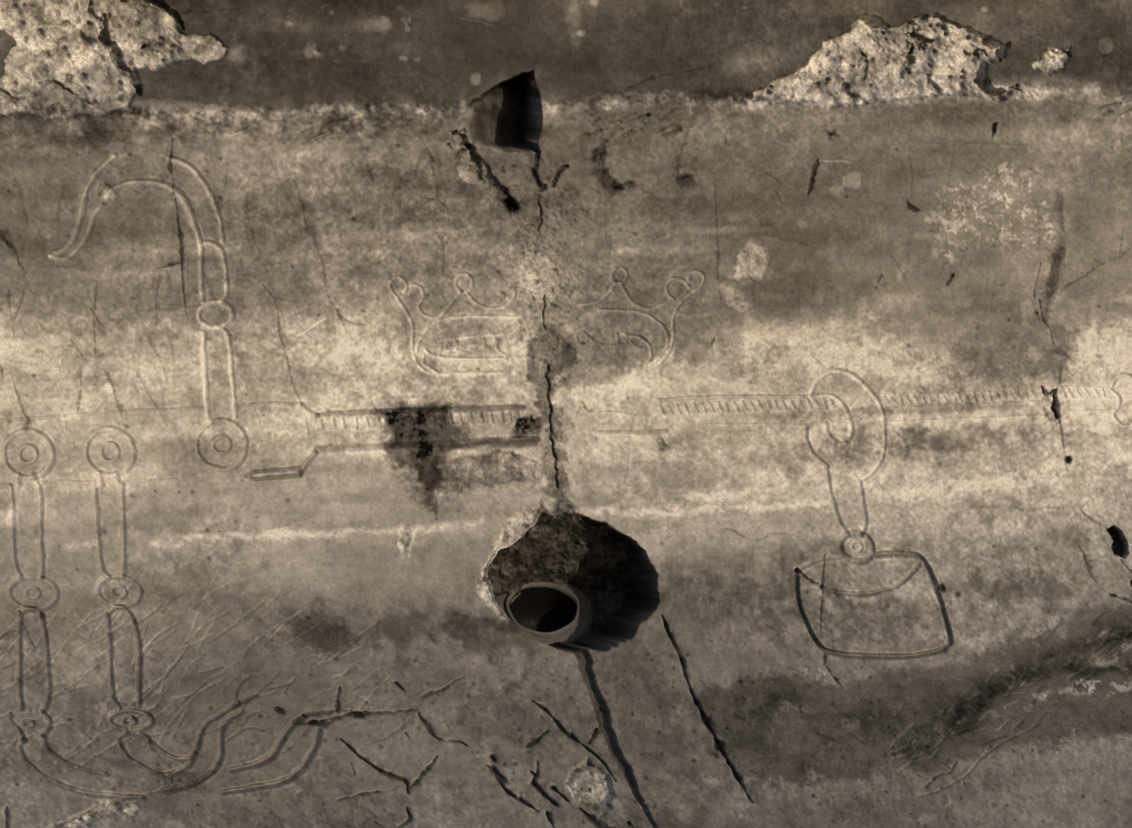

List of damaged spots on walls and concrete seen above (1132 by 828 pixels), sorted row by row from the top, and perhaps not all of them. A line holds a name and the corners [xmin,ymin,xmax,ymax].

spalling [0,0,233,121]
spalling [750,12,1026,109]
spalling [447,127,508,202]
crack [1056,358,1069,385]
leakage [147,387,542,559]
crack [1058,420,1066,456]
leakage [58,535,108,556]
crack [975,482,1132,601]
crack [661,615,695,697]
crack [293,677,634,828]
crack [703,726,753,803]